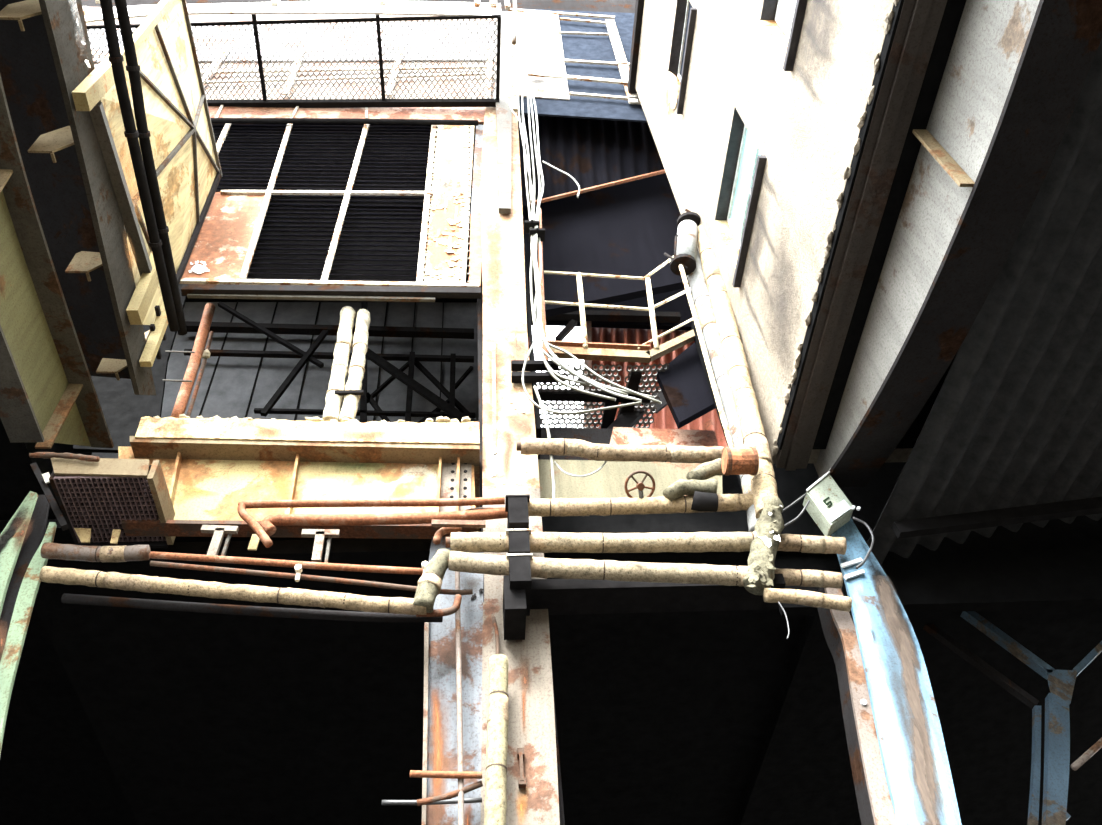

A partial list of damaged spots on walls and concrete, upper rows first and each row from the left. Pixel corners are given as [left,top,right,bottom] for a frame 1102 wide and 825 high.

peeling [423,186,467,283]
corrosion [488,234,499,300]
corrosion [489,356,501,403]
corrosion [504,416,530,472]
corrosion [17,520,30,542]
corrosion [521,667,529,725]
corrosion [876,577,942,825]
corrosion [431,696,446,796]